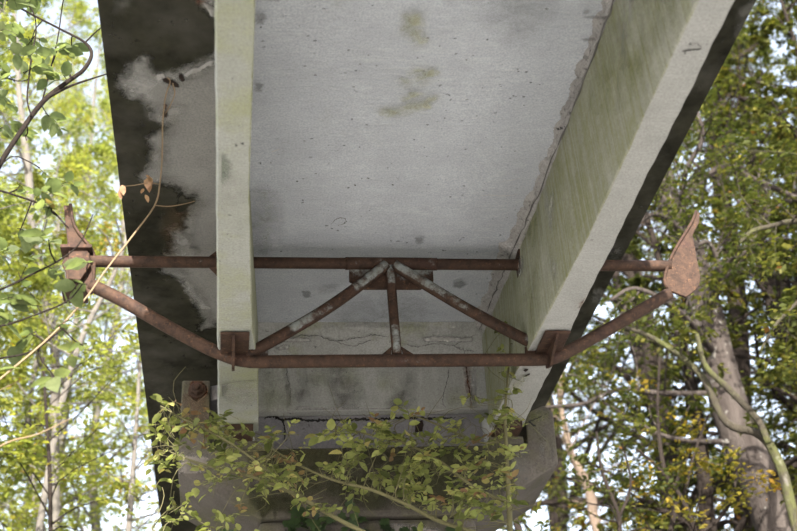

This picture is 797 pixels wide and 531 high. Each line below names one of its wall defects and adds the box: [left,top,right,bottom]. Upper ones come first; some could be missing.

leakage [97,0,215,256]
leakage [130,268,217,345]
leakage [136,316,218,531]